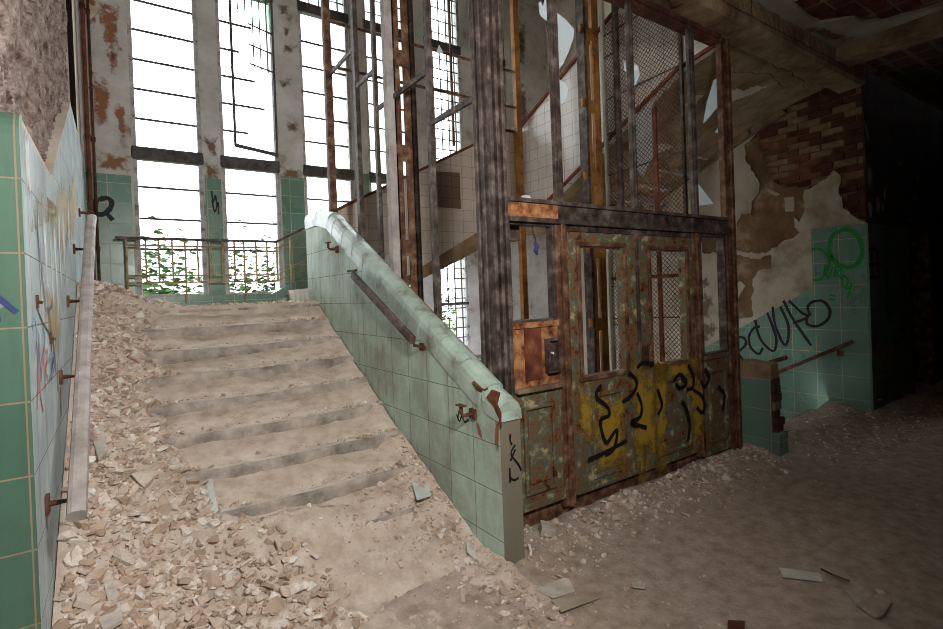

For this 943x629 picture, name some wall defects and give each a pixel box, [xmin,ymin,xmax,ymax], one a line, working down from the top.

peeling [0,0,69,162]
flaking render [736,88,886,319]
spalling [486,390,502,428]